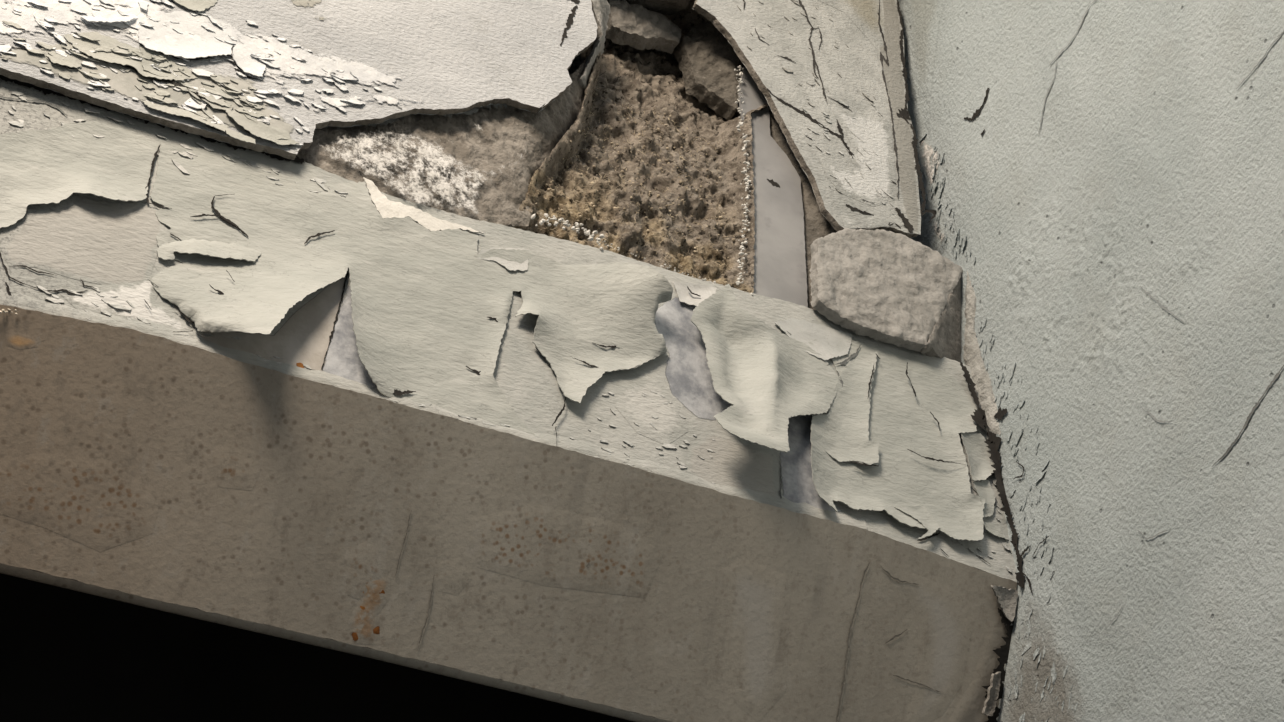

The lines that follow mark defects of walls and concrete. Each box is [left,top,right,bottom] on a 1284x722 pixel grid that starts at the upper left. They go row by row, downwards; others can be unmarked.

crack [560,0,580,46]
crack [743,0,854,158]
crack [846,0,937,233]
crack [1038,0,1095,134]
crack [1236,30,1284,90]
peeling [0,0,1054,603]
crack [1213,365,1284,466]
peeling [1008,609,1078,722]